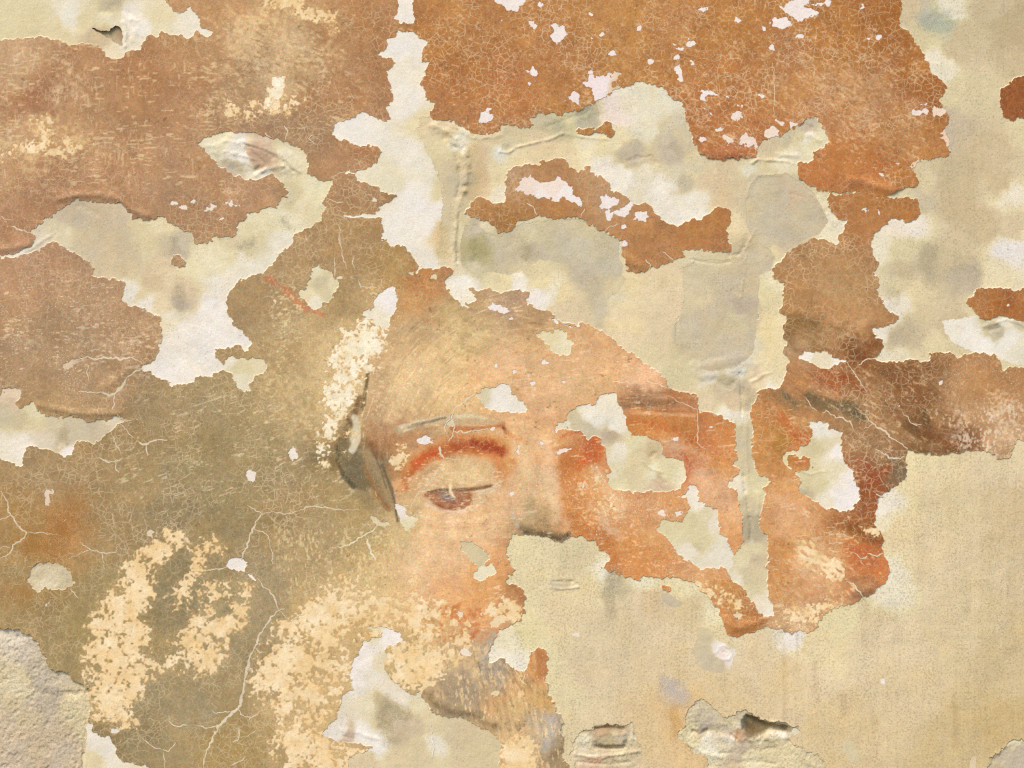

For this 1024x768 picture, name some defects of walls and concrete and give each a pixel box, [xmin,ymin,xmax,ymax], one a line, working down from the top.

peeling [0,0,213,59]
peeling [0,74,333,392]
peeling [298,264,343,310]
peeling [316,286,398,468]
peeling [332,0,1024,471]
crack [0,491,118,569]
spalling [0,527,256,768]
crack [143,505,377,768]
peeling [242,385,1024,768]